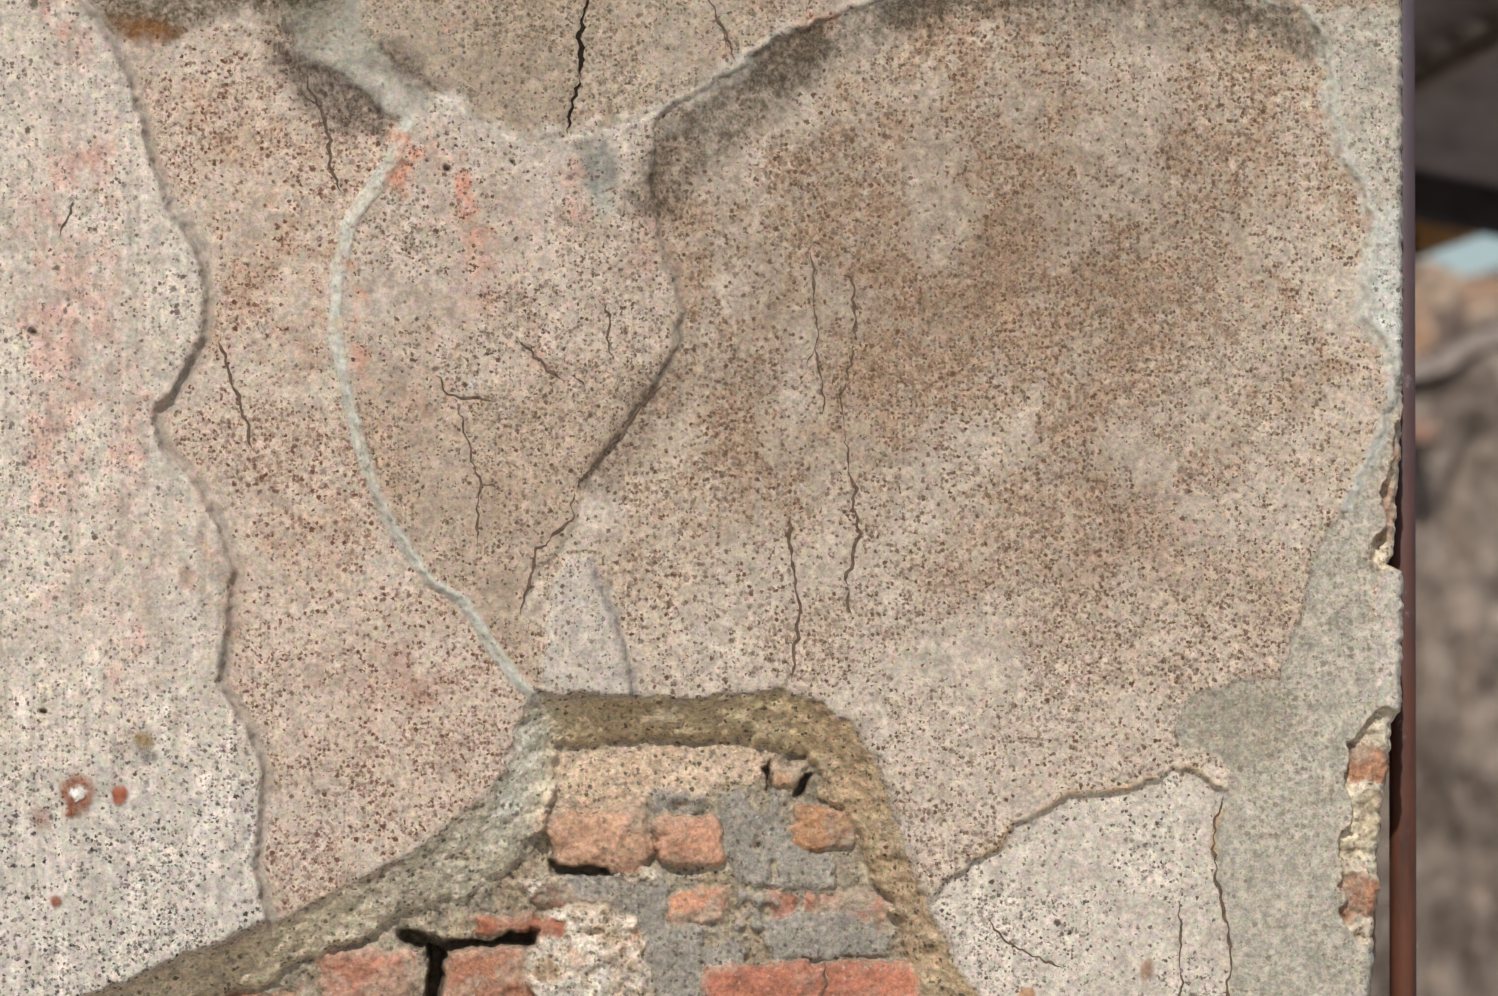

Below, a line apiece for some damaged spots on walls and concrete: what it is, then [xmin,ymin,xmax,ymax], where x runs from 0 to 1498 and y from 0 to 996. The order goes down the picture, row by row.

leakage [95,0,314,37]
leakage [273,42,383,133]
crack [566,0,589,133]
leakage [632,0,988,215]
leakage [1202,0,1322,57]
peeling [77,0,982,996]
crack [802,252,862,614]
peeling [523,0,1391,996]
spalling [1374,422,1402,546]
crack [787,517,802,682]
peeling [1371,572,1404,713]
crack [1210,796,1233,996]